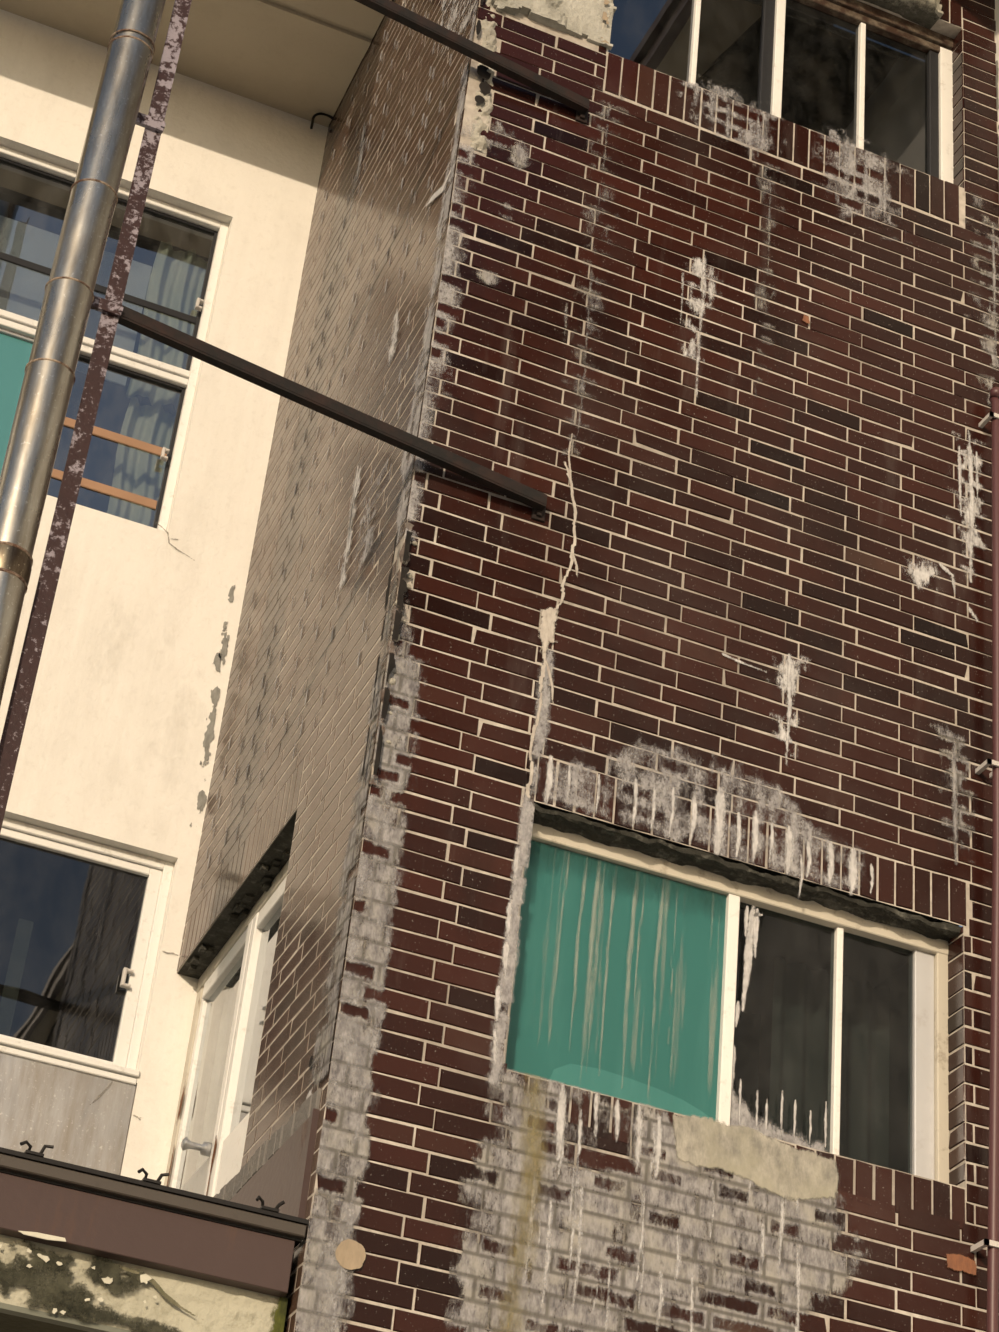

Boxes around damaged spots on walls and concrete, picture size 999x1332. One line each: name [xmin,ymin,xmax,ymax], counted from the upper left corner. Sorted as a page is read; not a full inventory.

spalling [467,0,617,154]
spalling [923,0,943,20]
efflorescence [825,130,902,224]
efflorescence [681,257,715,393]
efflorescence [908,430,985,590]
crack [525,434,578,798]
peeling [200,621,230,767]
efflorescence [776,654,808,763]
peeling [190,790,207,827]
efflorescence [934,725,974,864]
damp [444,740,874,1332]
mould [53,1298,181,1332]